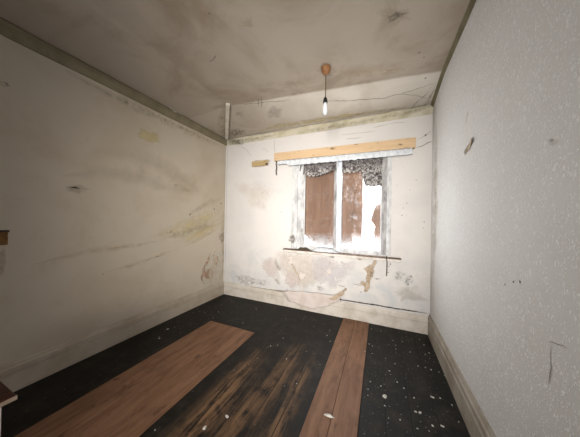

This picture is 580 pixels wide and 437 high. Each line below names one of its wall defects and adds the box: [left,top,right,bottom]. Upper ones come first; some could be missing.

crack [327,85,427,101]